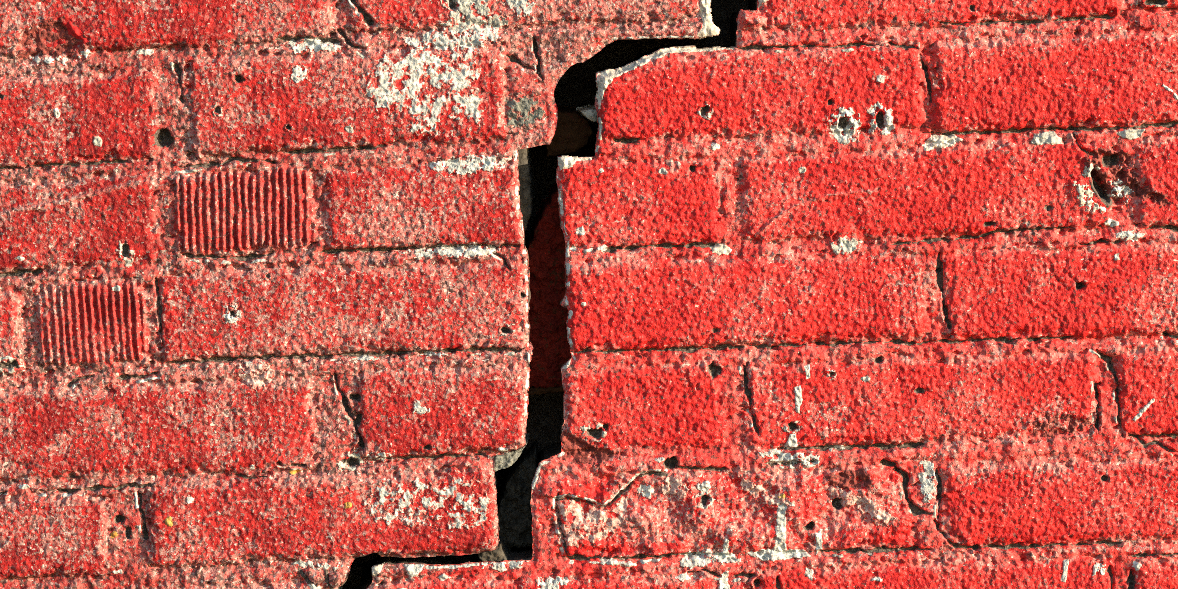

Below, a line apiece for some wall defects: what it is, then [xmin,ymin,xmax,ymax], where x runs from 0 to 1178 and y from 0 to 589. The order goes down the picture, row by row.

peeling [361,0,536,139]
peeling [502,90,545,134]
spalling [1073,128,1174,261]
crack [292,0,769,589]